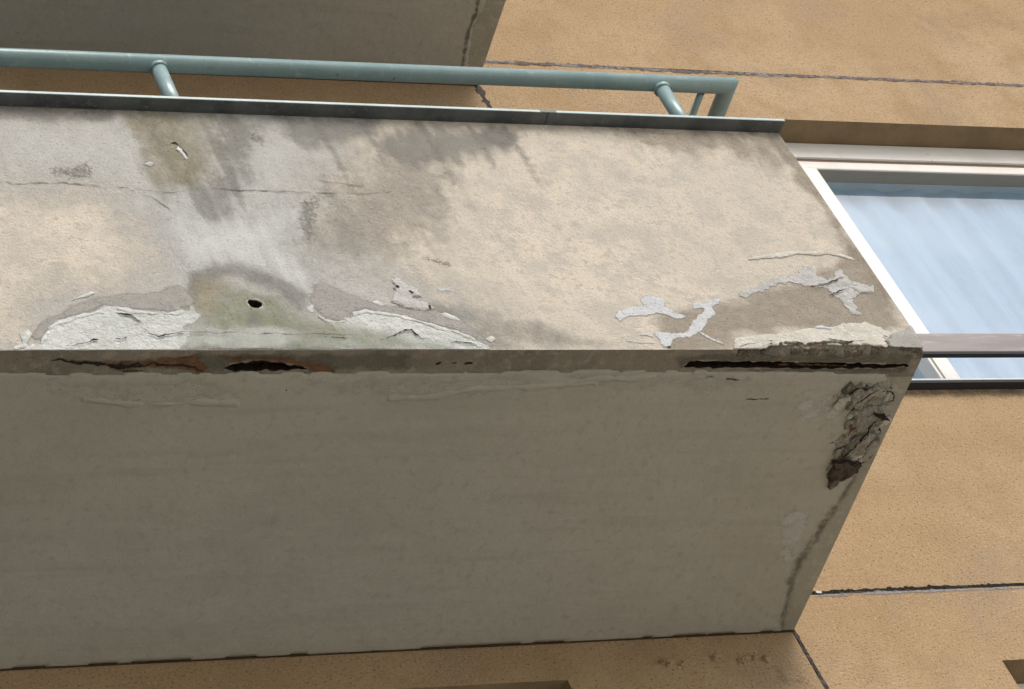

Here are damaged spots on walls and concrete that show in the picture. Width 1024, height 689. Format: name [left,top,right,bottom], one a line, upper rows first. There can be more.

crack [6,181,177,210]
crack [211,180,392,194]
water stain [0,106,512,371]
corrosion [105,357,206,373]
peeling [14,305,496,372]
spalling [615,266,924,490]